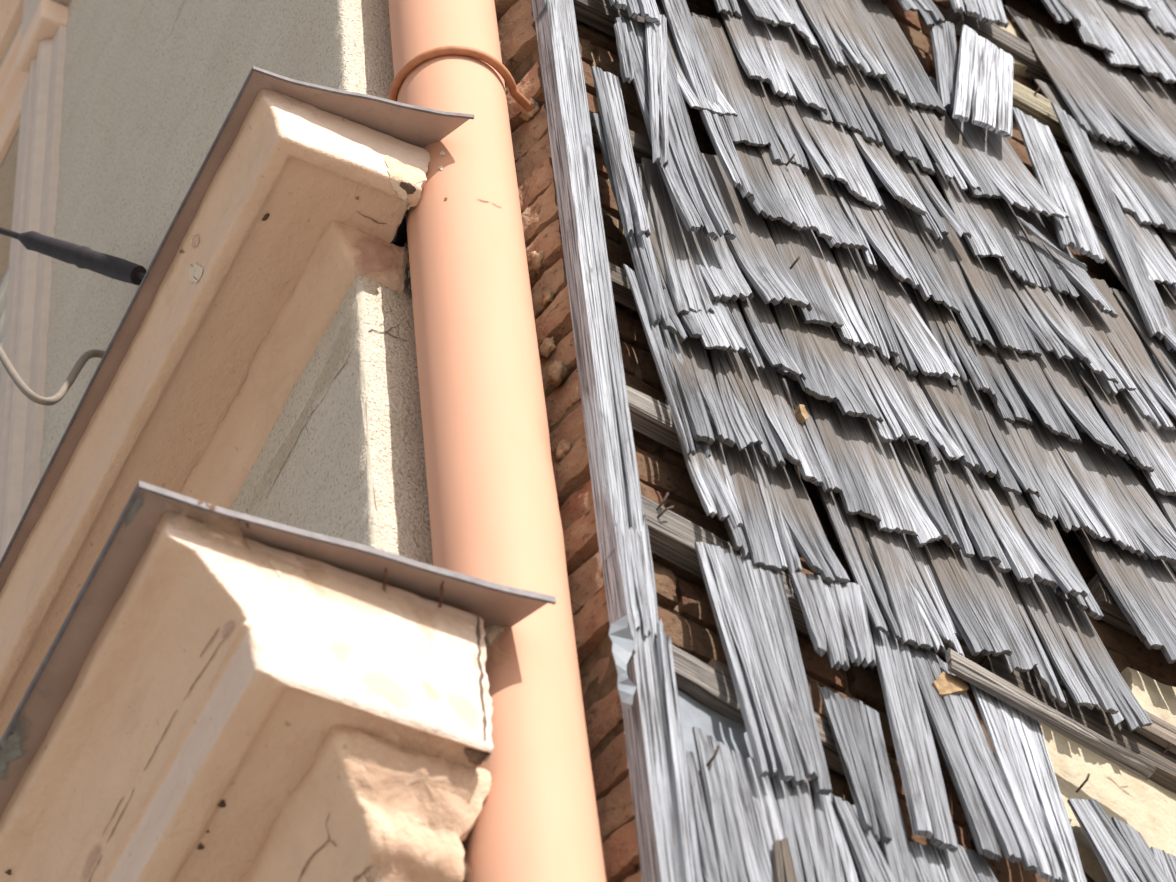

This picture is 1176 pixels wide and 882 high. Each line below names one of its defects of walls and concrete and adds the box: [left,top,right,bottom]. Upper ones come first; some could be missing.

spalling [385,155,426,292]
crack [474,616,489,741]
spalling [464,748,489,765]
crack [298,813,337,882]
crack [352,866,373,882]